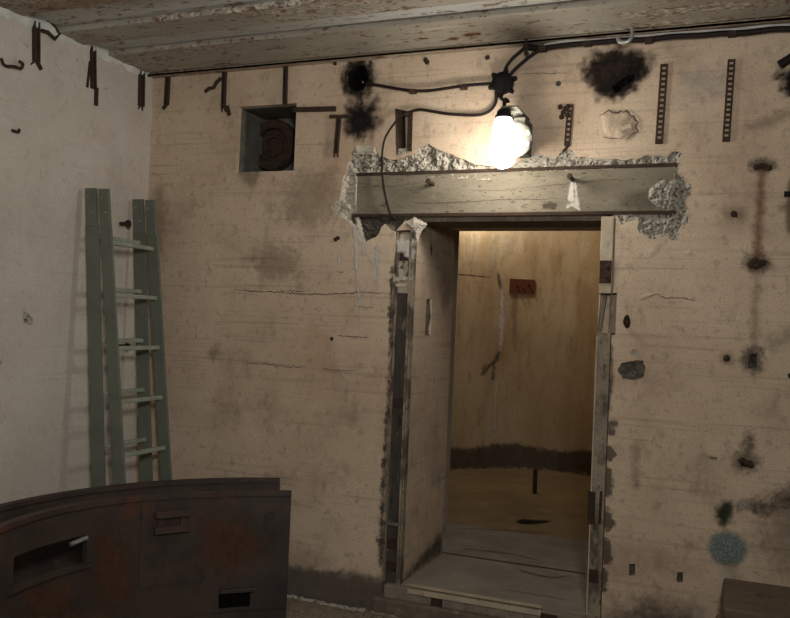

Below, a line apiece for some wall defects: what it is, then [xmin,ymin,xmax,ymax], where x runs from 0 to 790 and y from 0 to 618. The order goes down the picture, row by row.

spalling [330,145,497,243]
spalling [507,151,692,240]
spalling [609,350,645,393]
spalling [605,446,616,496]
spalling [601,507,615,592]